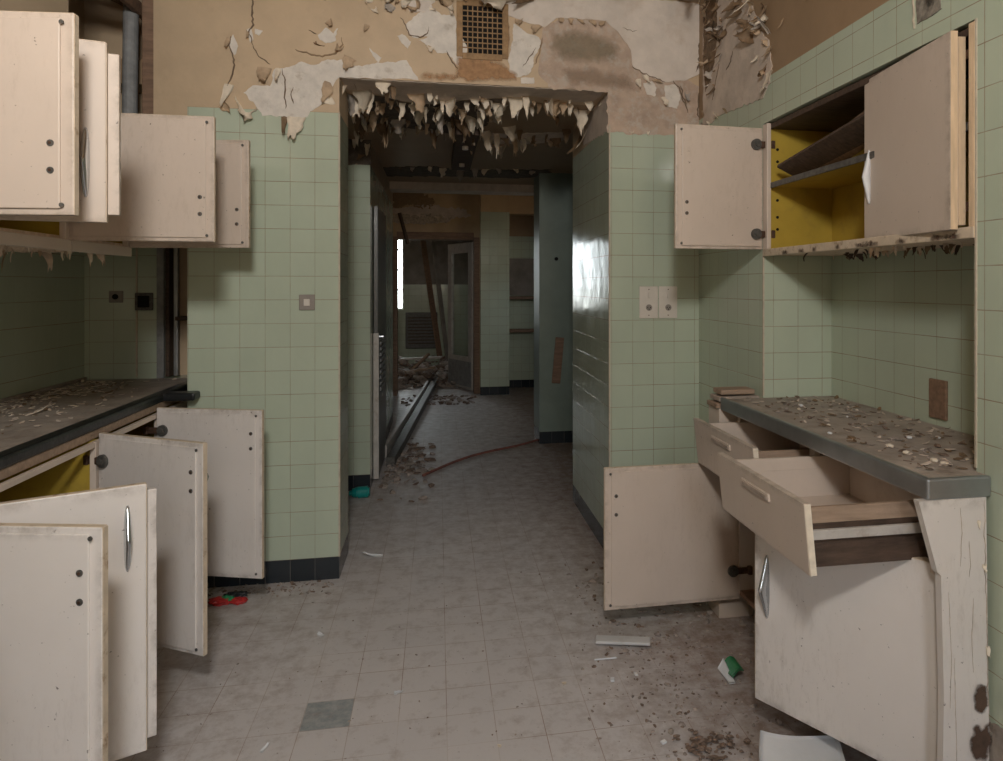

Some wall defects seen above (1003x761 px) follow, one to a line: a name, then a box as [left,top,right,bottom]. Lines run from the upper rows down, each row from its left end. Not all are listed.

spalling [216,0,783,182]